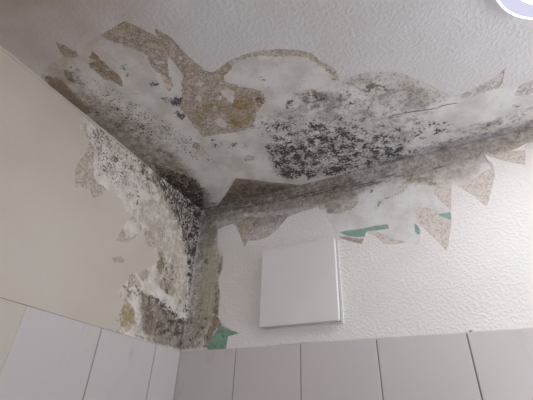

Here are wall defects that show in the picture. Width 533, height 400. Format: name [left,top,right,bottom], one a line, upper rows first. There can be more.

water stain [73,83,464,349]